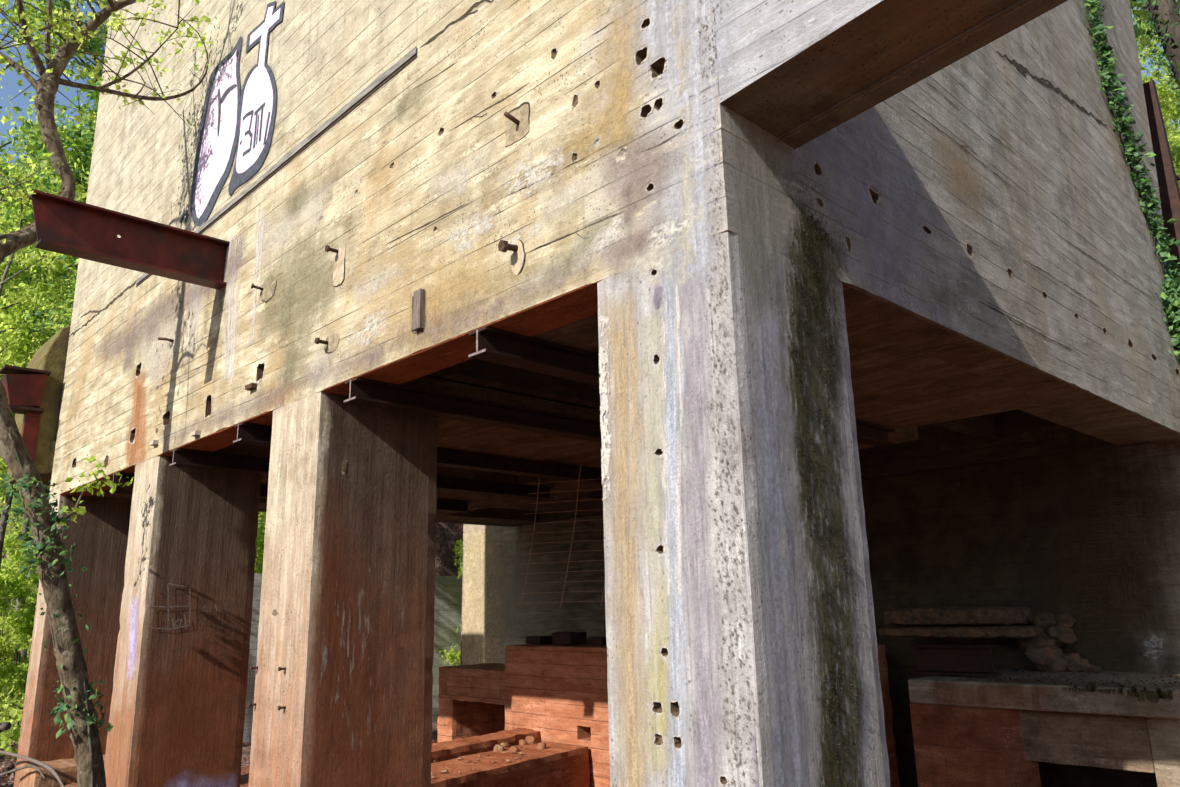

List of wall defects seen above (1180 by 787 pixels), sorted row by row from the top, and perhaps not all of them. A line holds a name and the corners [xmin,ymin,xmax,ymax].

crack [420,0,493,48]
crack [996,51,1107,126]
rust [127,373,145,462]
damp [756,317,814,787]
damp [821,635,842,787]